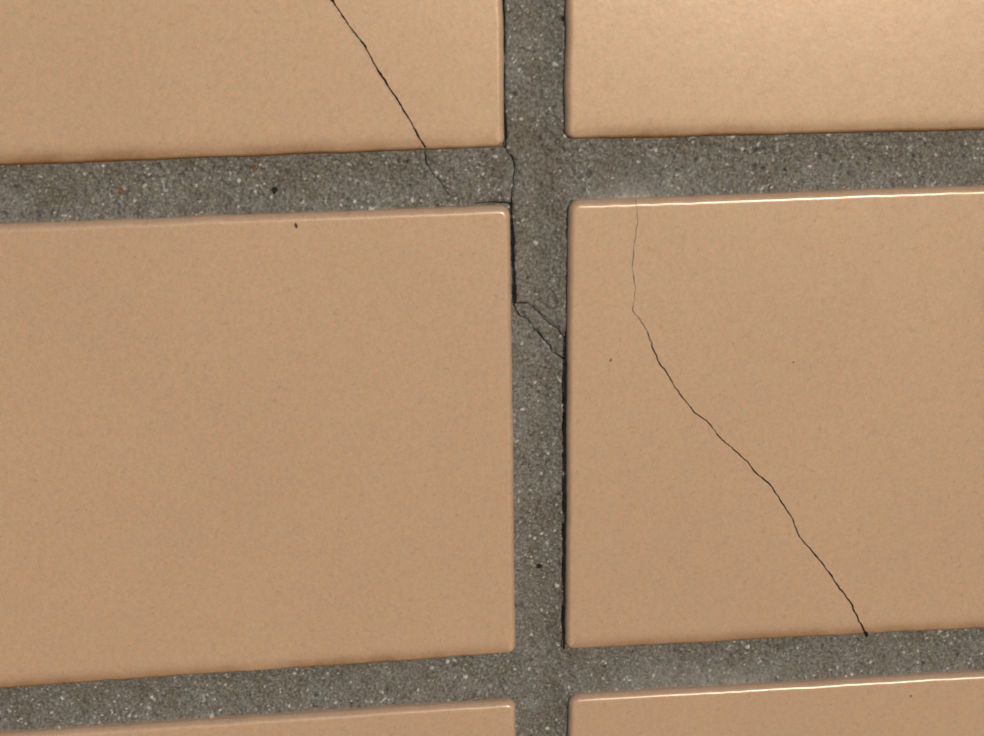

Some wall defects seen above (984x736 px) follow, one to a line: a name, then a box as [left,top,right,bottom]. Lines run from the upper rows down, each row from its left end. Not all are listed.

crack [331,0,450,196]
crack [475,146,515,204]
crack [513,302,565,360]
crack [632,307,868,637]